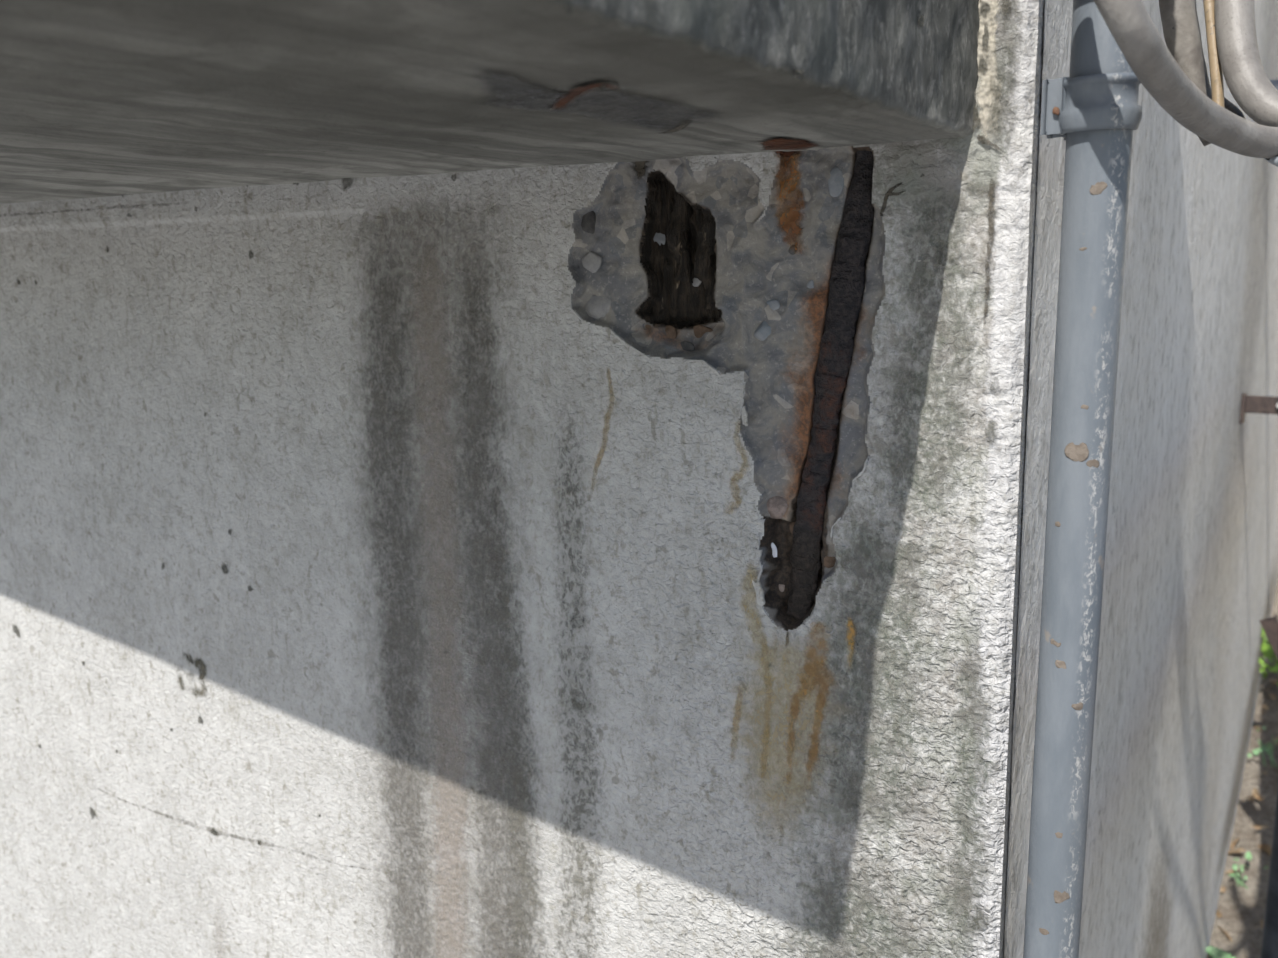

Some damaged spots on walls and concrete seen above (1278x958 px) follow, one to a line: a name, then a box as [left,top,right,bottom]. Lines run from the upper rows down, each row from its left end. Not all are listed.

damp [371,270,424,958]
damp [416,267,541,958]
damp [559,448,596,958]
spalling [567,146,886,631]
rust [743,625,830,821]
rust [761,139,818,252]